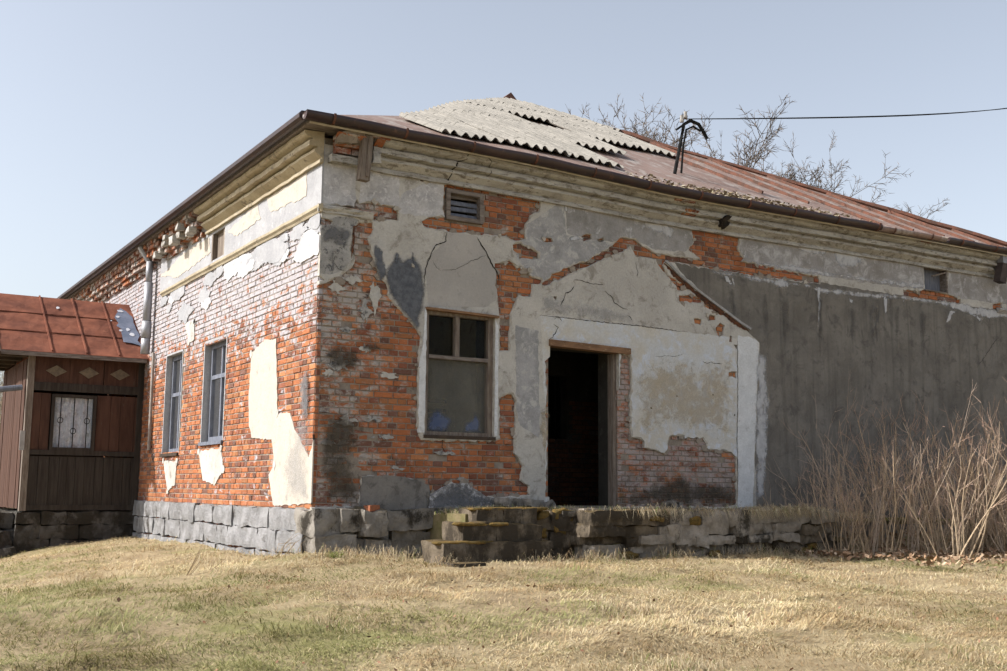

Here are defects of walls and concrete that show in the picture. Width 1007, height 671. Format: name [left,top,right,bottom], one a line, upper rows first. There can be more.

flaking render [228,172,307,236]
flaking render [160,213,331,346]
crack [424,233,499,283]
spalling [422,185,819,351]
leakage [329,344,379,368]
spalling [249,198,529,508]
leakage [300,371,308,417]
flaking render [162,458,178,494]
flaking render [197,444,225,486]
leakage [322,416,358,499]
spalling [616,355,736,507]